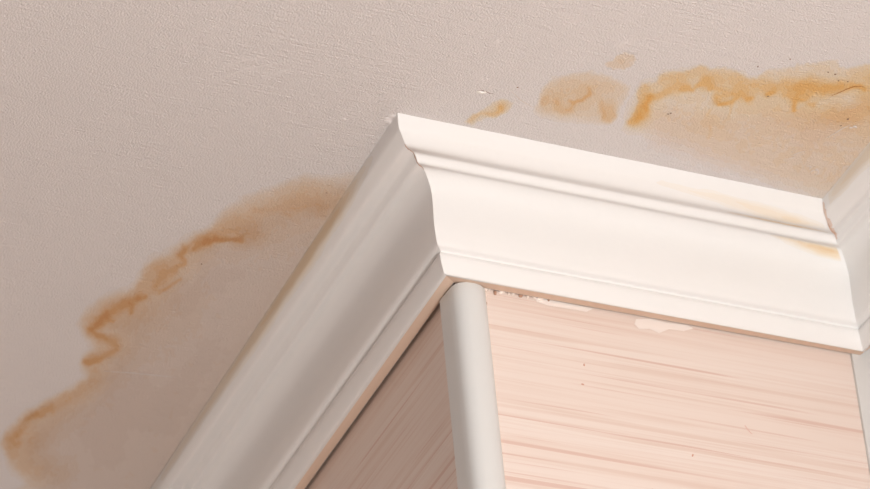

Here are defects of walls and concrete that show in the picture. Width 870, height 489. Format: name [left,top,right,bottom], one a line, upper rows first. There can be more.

water stain [464,98,514,126]
water stain [533,52,870,199]
water stain [0,171,357,489]